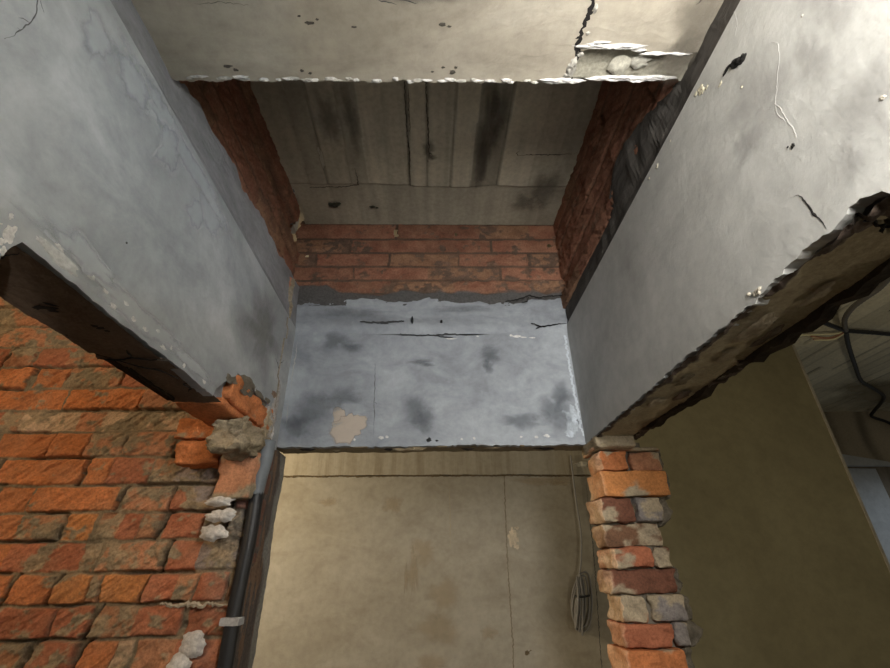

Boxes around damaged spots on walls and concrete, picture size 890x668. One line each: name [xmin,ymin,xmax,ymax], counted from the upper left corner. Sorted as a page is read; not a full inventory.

crack [7,0,44,38]
spalling [186,65,359,83]
spalling [372,31,693,84]
crack [571,0,595,79]
crack [796,195,826,228]
spalling [0,213,18,256]
spalling [226,373,281,440]
leakage [330,407,366,444]